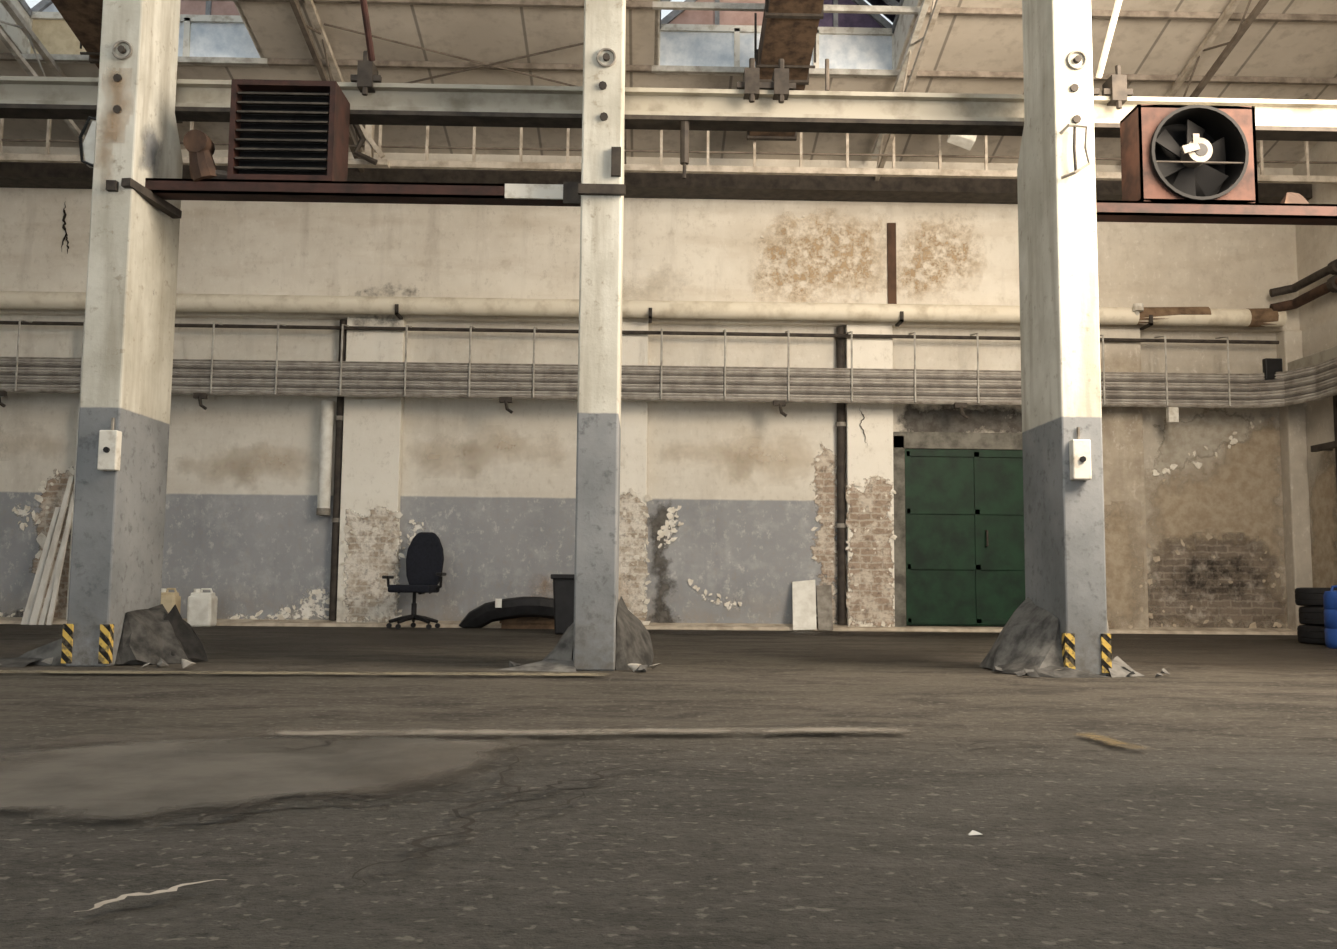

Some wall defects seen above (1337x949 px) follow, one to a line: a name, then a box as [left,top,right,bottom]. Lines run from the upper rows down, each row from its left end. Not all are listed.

peeling [759,215,886,301]
peeling [899,228,968,293]
flaking render [12,466,75,618]
flaking render [228,506,424,623]
flaking render [618,488,684,625]
flaking render [810,444,897,627]
flaking render [1104,502,1286,629]
crack [131,748,683,888]